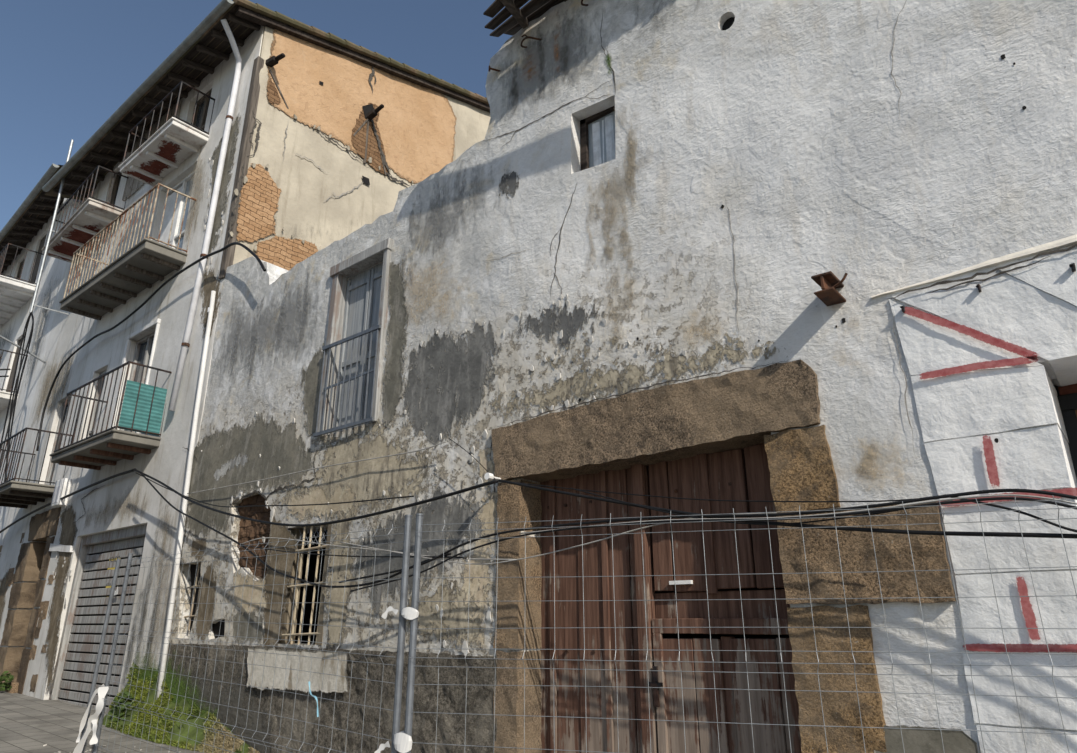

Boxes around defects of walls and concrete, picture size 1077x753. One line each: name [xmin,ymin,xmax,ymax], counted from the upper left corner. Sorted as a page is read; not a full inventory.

spalling [200,113,318,339]
crack [226,112,410,245]
spalling [267,29,457,184]
crack [368,66,376,93]
crack [415,14,616,256]
crack [487,184,577,301]
crack [891,2,906,115]
crack [888,244,1077,457]
spalling [187,259,788,656]
flaking render [0,564,11,623]
flaking render [44,503,78,691]